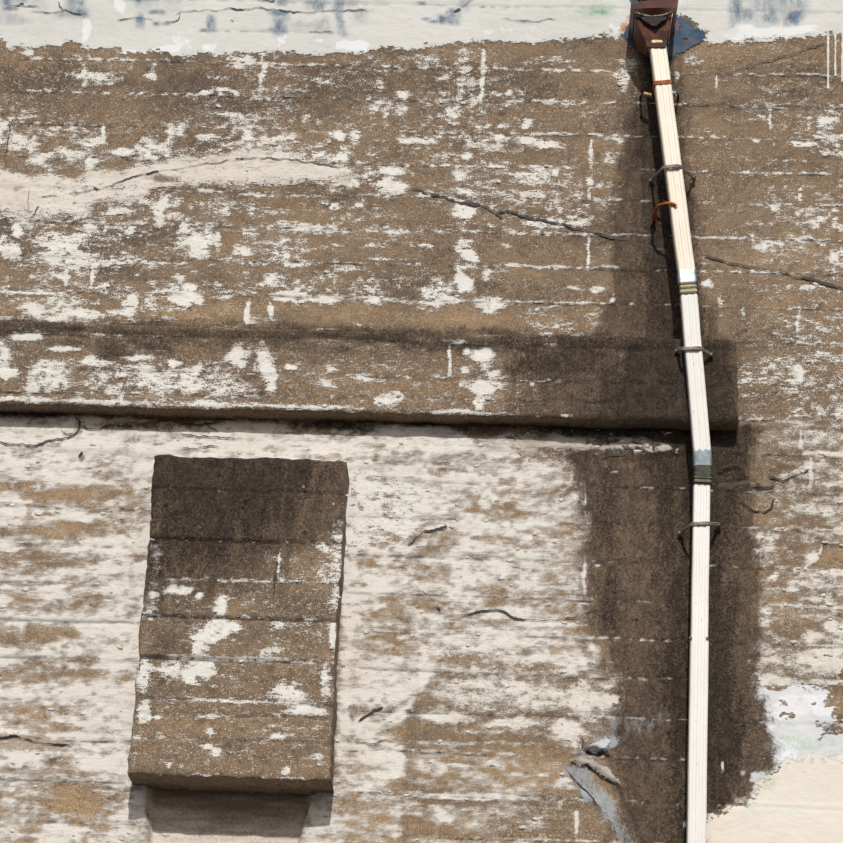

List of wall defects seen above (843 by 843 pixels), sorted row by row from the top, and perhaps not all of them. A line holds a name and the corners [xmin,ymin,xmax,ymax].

peeling [670,48,705,88]
crack [411,188,673,252]
crack [702,255,843,289]
crack [0,416,133,457]
crack [153,419,229,449]
leakage [0,57,693,843]
leakage [669,58,778,814]
peeling [707,770,772,814]